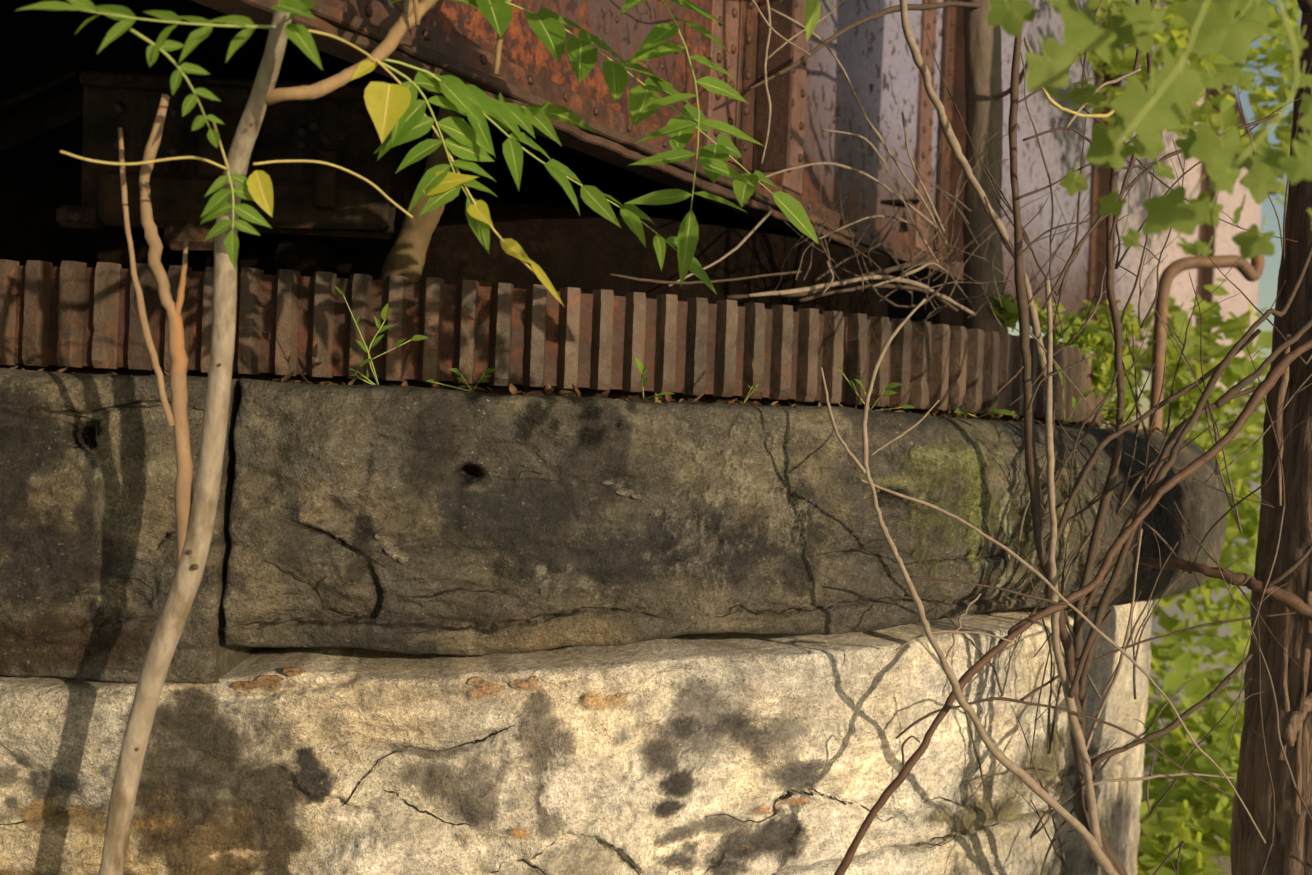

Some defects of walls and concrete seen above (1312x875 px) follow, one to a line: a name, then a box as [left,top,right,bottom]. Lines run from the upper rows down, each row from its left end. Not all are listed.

water stain [0,387,147,674]
water stain [347,515,376,585]
crack [221,520,664,635]
water stain [407,404,828,595]
crack [716,597,966,618]
crack [812,539,1014,565]
water stain [911,442,1038,597]
water stain [1058,505,1070,581]
crack [341,726,512,826]
water stain [123,678,832,875]
crack [705,788,1004,848]